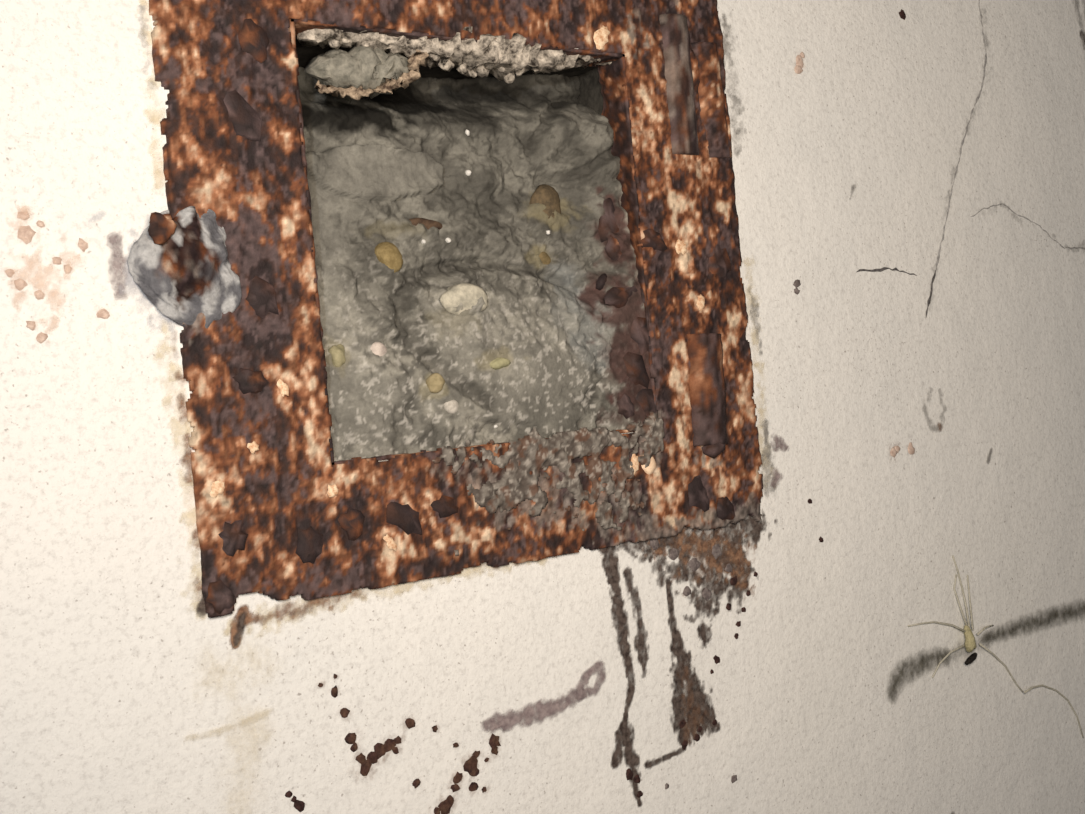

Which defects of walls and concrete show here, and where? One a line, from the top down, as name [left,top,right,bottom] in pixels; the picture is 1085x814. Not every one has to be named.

crack [857,0,1085,317]
rust [165,397,193,485]
rust [193,568,206,616]
rust [225,596,340,649]
rust [447,558,546,579]
rust [599,514,776,807]